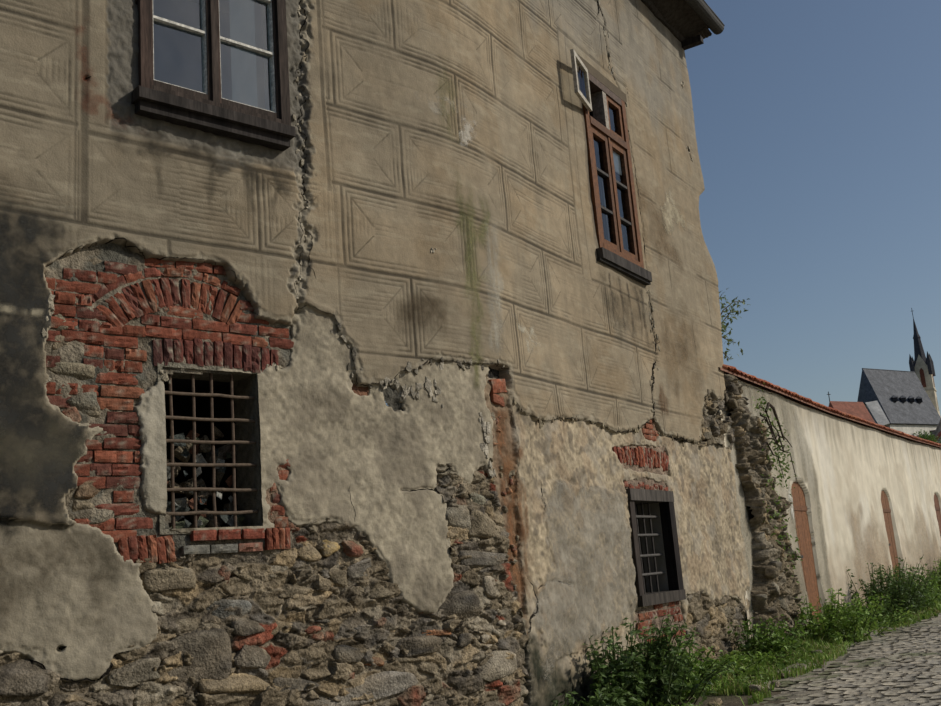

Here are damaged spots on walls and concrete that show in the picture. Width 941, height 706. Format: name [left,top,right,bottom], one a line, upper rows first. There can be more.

crack [292,1,337,321]
crack [595,0,627,107]
flaking render [41,243,296,569]
crack [646,268,693,444]